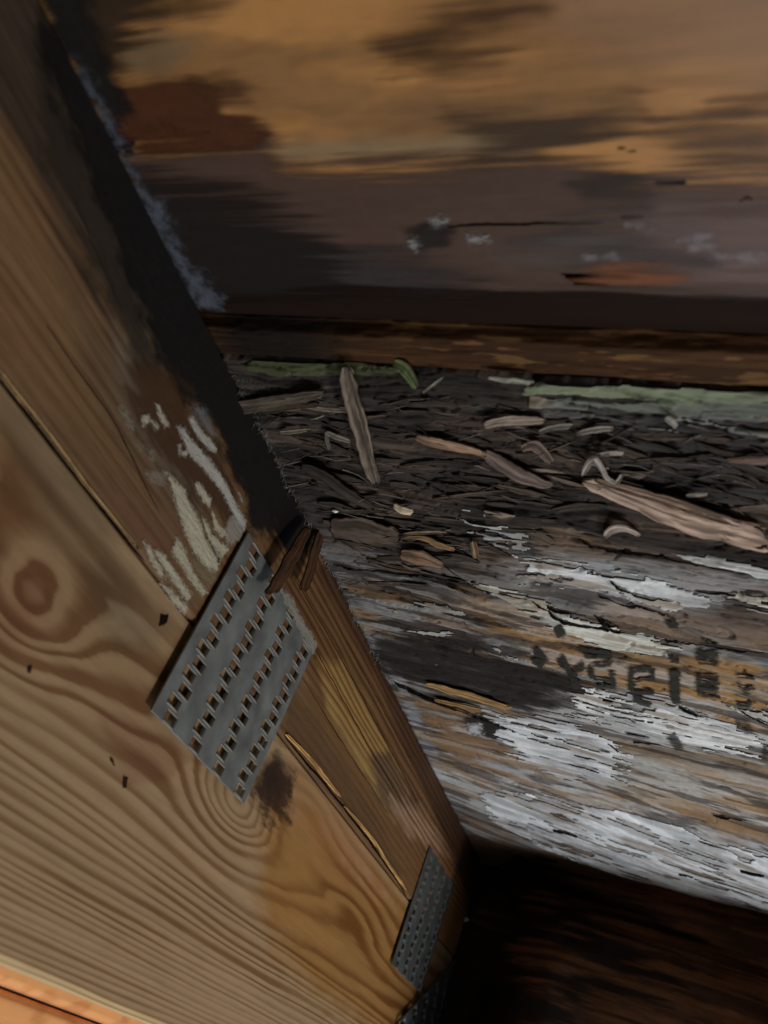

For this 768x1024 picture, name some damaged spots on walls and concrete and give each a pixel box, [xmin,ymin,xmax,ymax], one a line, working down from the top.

water stain [37,0,768,615]
crack [0,381,144,560]
water stain [251,756,293,827]
crack [284,736,406,896]
crack [267,563,527,849]